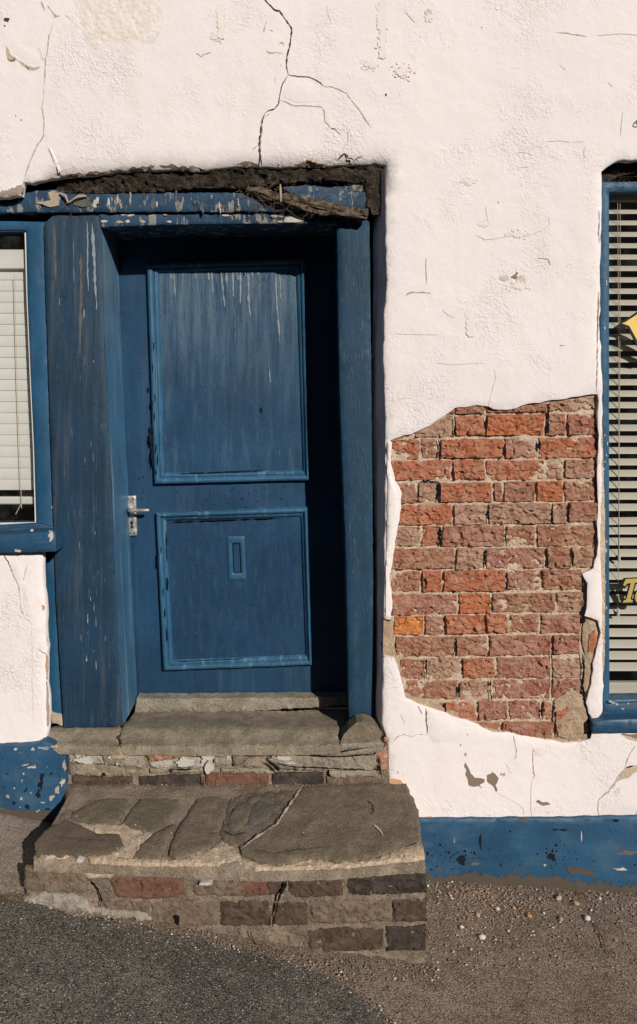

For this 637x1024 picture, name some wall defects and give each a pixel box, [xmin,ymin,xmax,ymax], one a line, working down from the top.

crack [24,1,73,180]
crack [249,0,371,167]
spalling [37,157,384,223]
flaking render [381,394,608,742]
peeling [0,745,66,812]
peeling [464,763,499,792]
crack [495,738,535,815]
crack [597,748,634,814]
peeling [426,834,482,871]
peeling [537,829,577,869]
peeling [612,850,637,871]